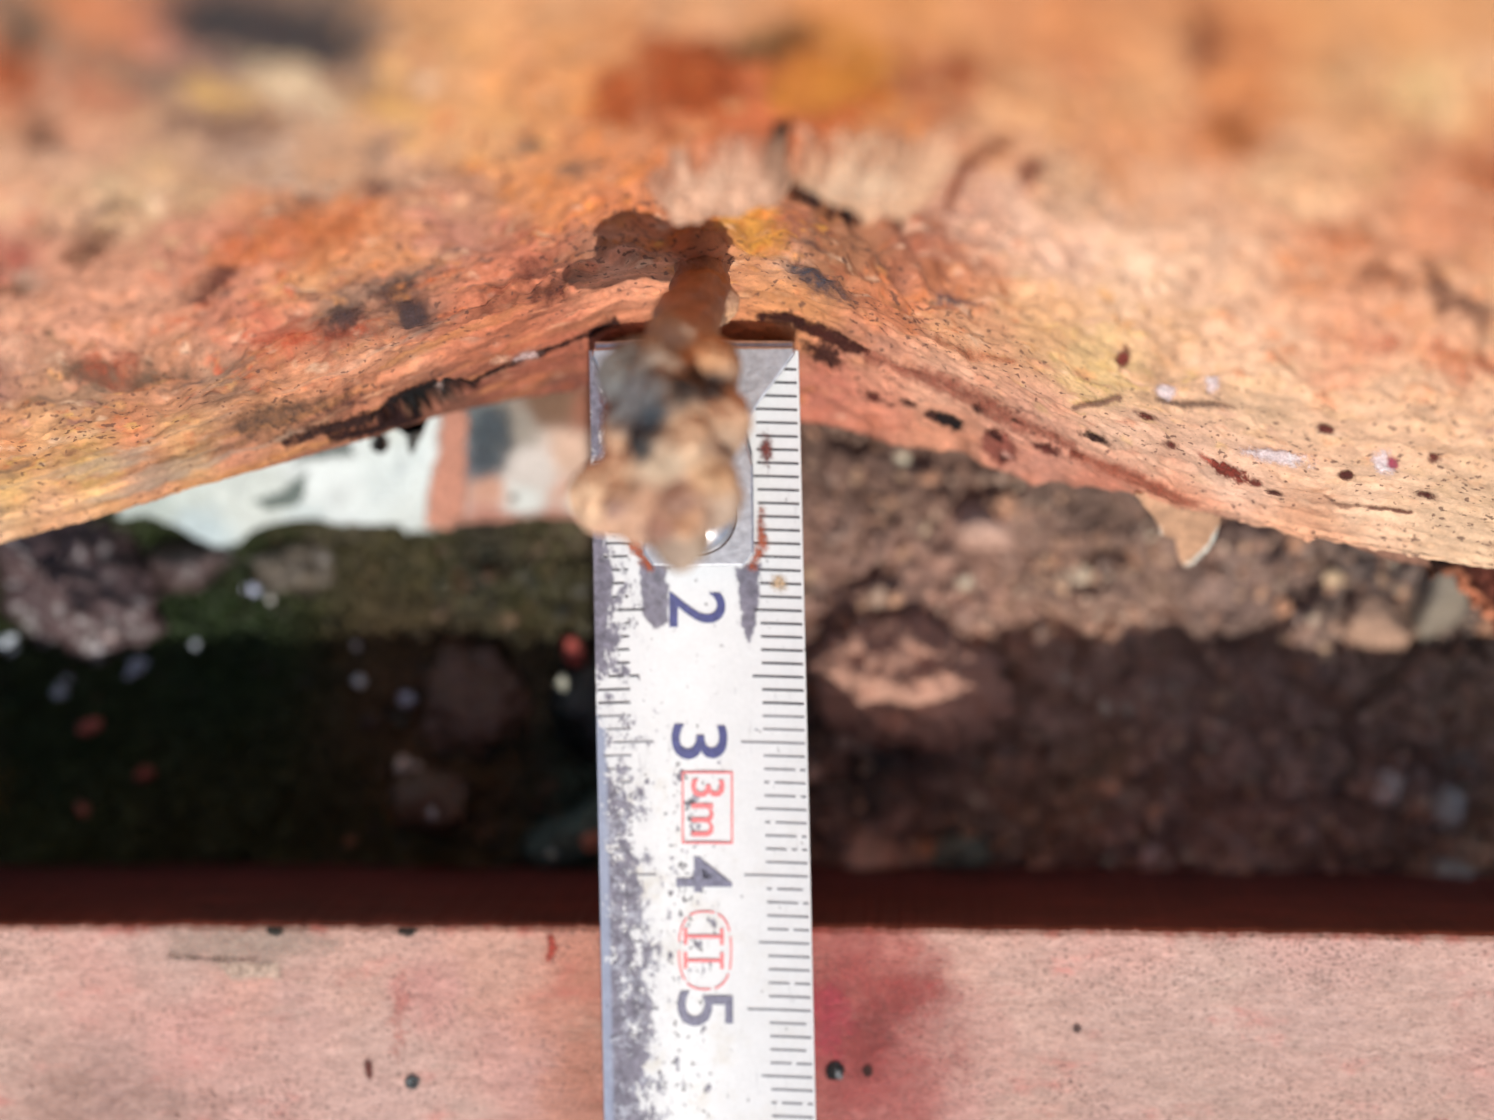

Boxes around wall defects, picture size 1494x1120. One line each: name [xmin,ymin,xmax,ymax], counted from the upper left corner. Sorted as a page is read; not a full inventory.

crack [282,317,620,447]
rust [761,435,772,467]
rust [629,543,653,571]
rust [749,507,768,570]
rust [1423,560,1494,631]